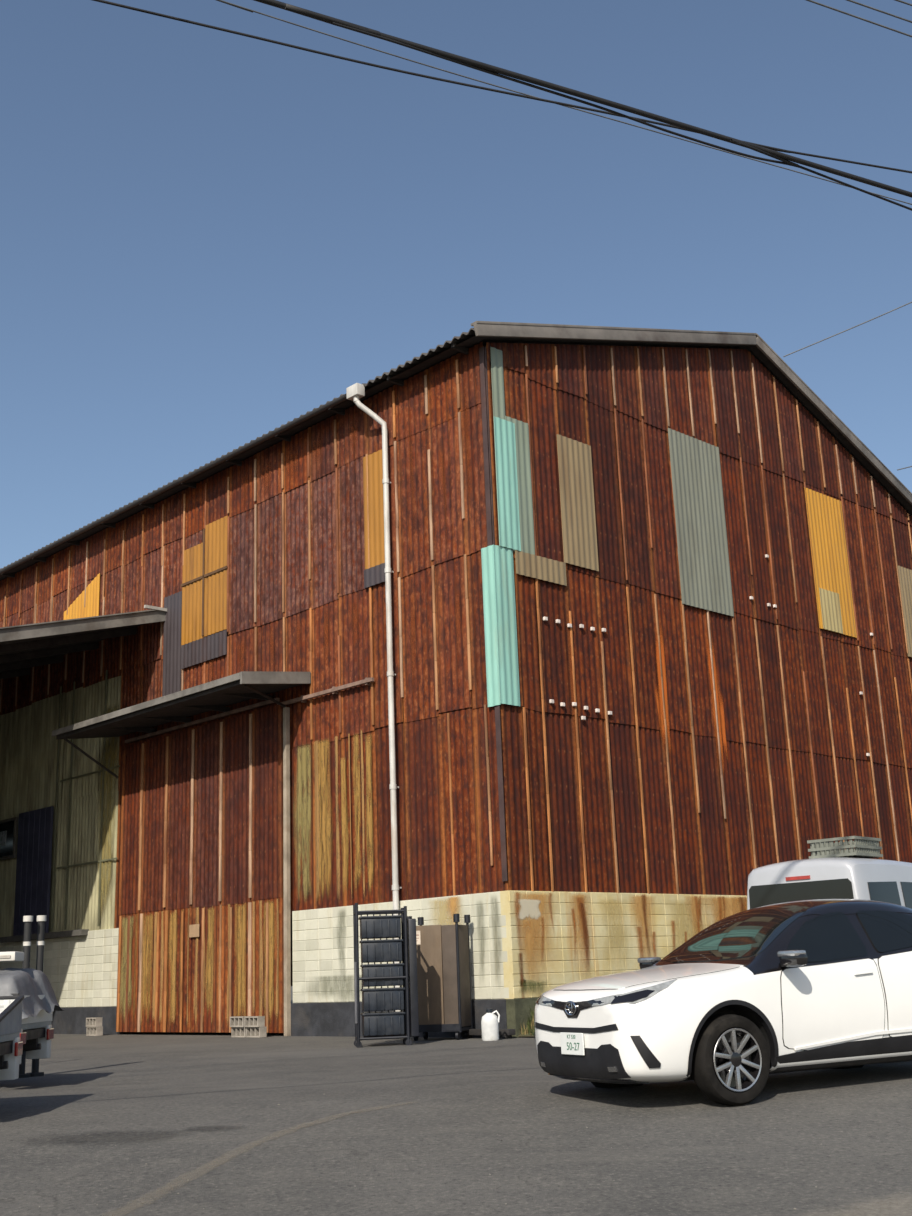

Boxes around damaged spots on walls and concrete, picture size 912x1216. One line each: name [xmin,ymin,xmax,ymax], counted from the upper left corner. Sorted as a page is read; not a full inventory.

rust [656,637,670,741]
rust [708,649,727,760]
rust [516,893,552,989]
rust [572,895,588,950]
rust [635,895,656,955]
rust [672,897,747,945]